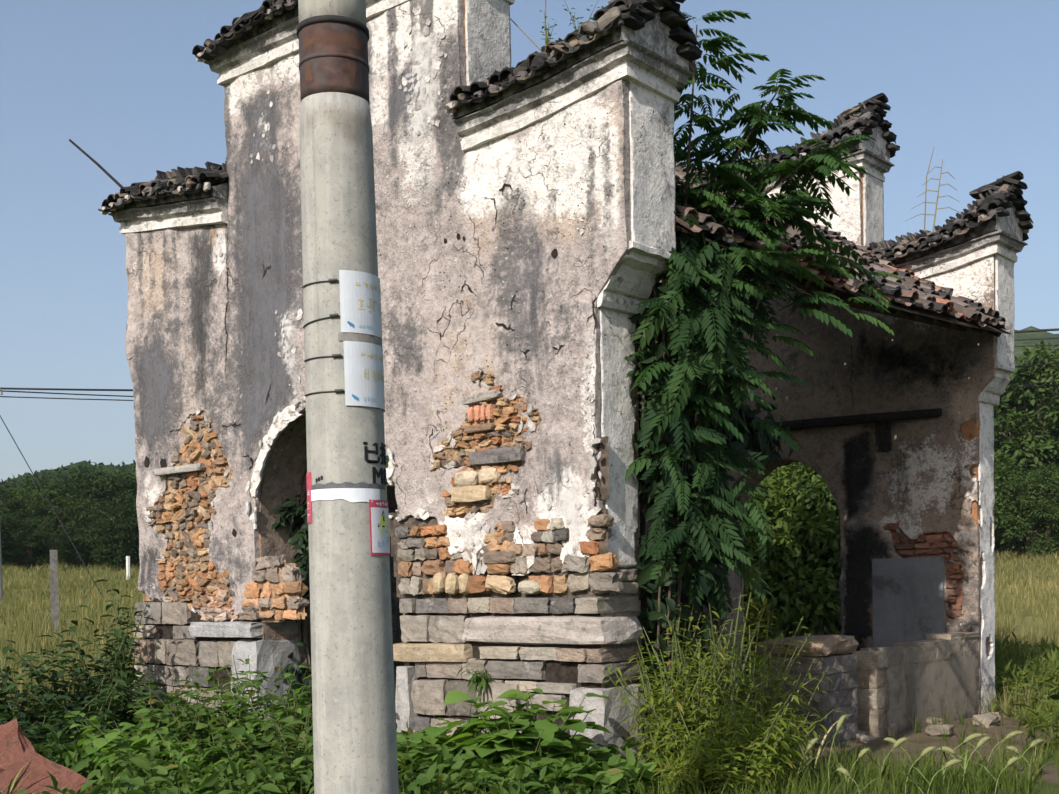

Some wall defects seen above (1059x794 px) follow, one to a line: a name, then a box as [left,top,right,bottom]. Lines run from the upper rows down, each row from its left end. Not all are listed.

water stain [389,70,420,133]
crack [485,183,512,230]
water stain [191,242,212,388]
water stain [234,94,294,468]
crack [436,280,476,355]
crack [495,294,564,358]
crack [586,296,598,330]
spalling [146,411,309,622]
peeling [245,308,306,529]
peeling [386,448,396,485]
spalling [389,369,624,601]
water stain [842,433,889,654]